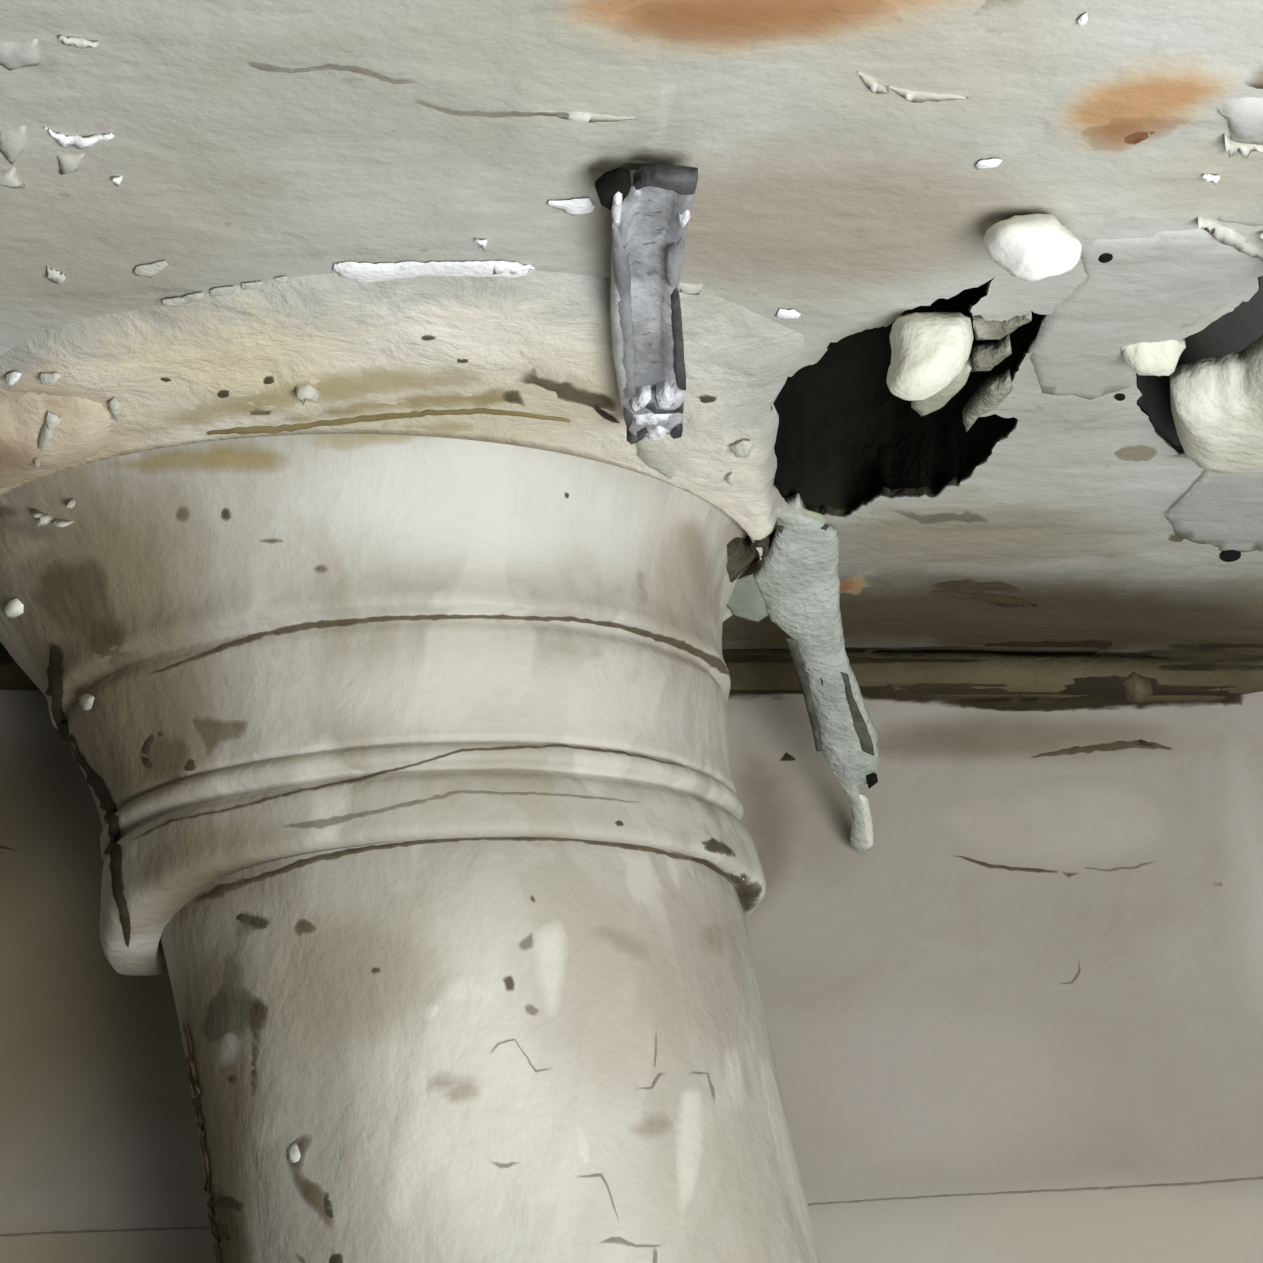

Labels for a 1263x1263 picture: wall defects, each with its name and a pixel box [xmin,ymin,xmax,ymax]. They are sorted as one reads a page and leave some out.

peeling [1217,75,1263,158]
peeling [976,158,1003,170]
peeling [1202,173,1220,185]
peeling [911,194,1263,454]